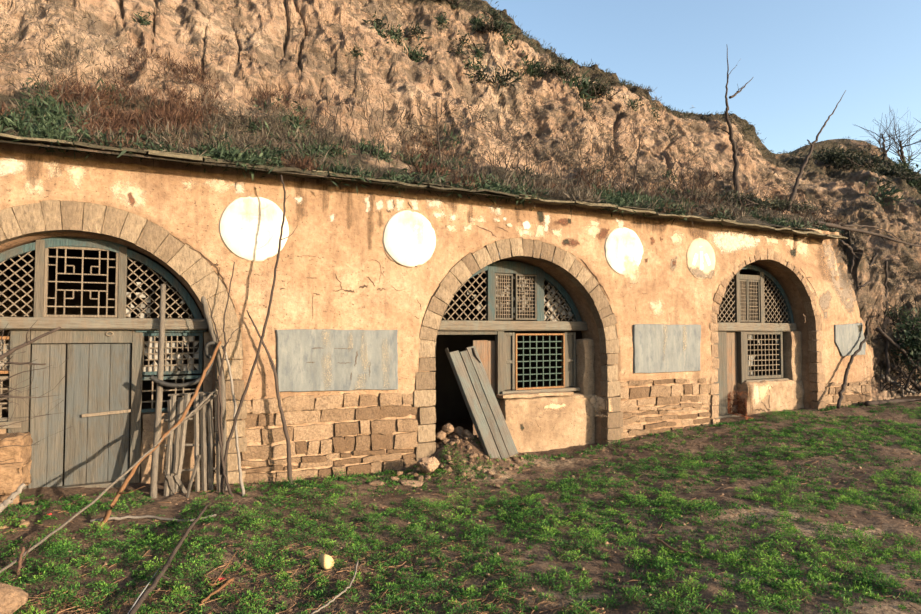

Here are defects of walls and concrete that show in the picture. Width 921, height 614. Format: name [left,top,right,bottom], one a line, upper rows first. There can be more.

peeling [365,196,580,246]
peeling [586,217,624,238]